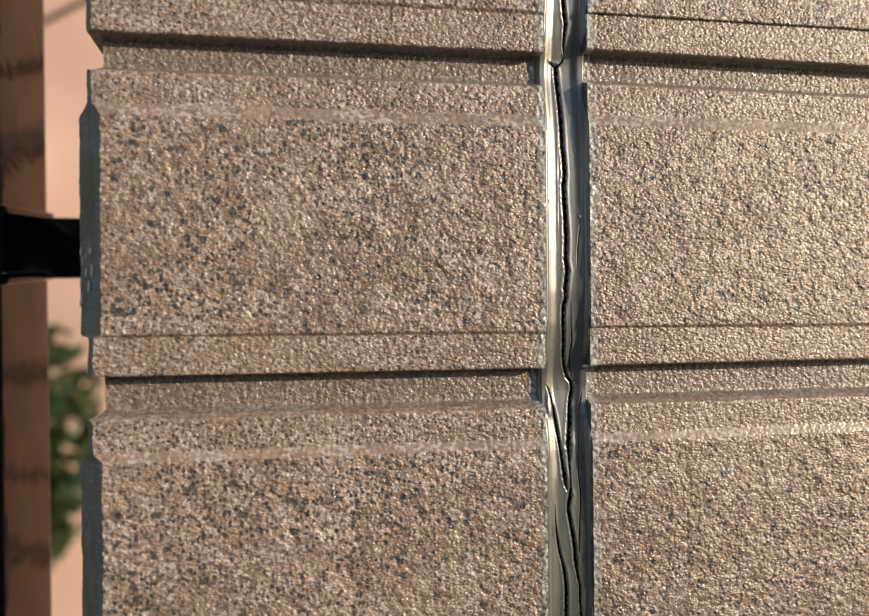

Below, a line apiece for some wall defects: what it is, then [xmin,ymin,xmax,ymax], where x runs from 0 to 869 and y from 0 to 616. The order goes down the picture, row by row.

crack [547,0,582,616]